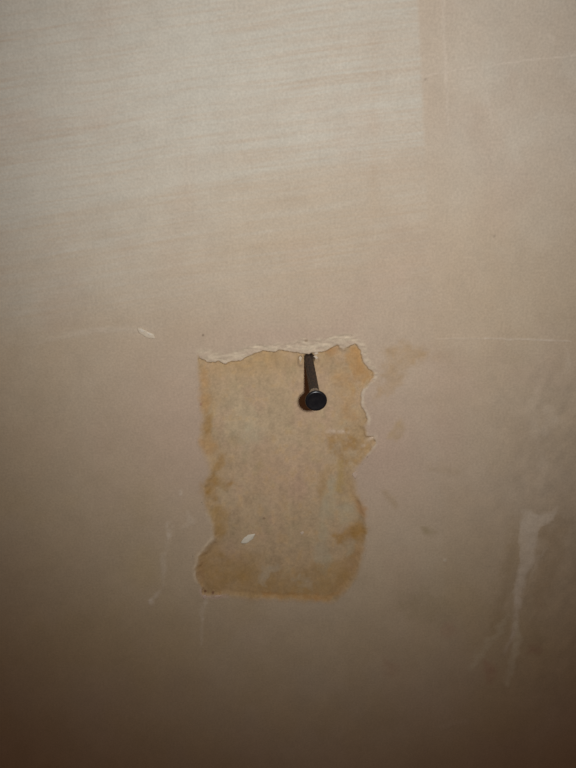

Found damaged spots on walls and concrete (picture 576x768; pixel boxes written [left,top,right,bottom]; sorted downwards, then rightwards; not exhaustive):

flaking render [190,331,380,607]
water stain [465,505,576,690]